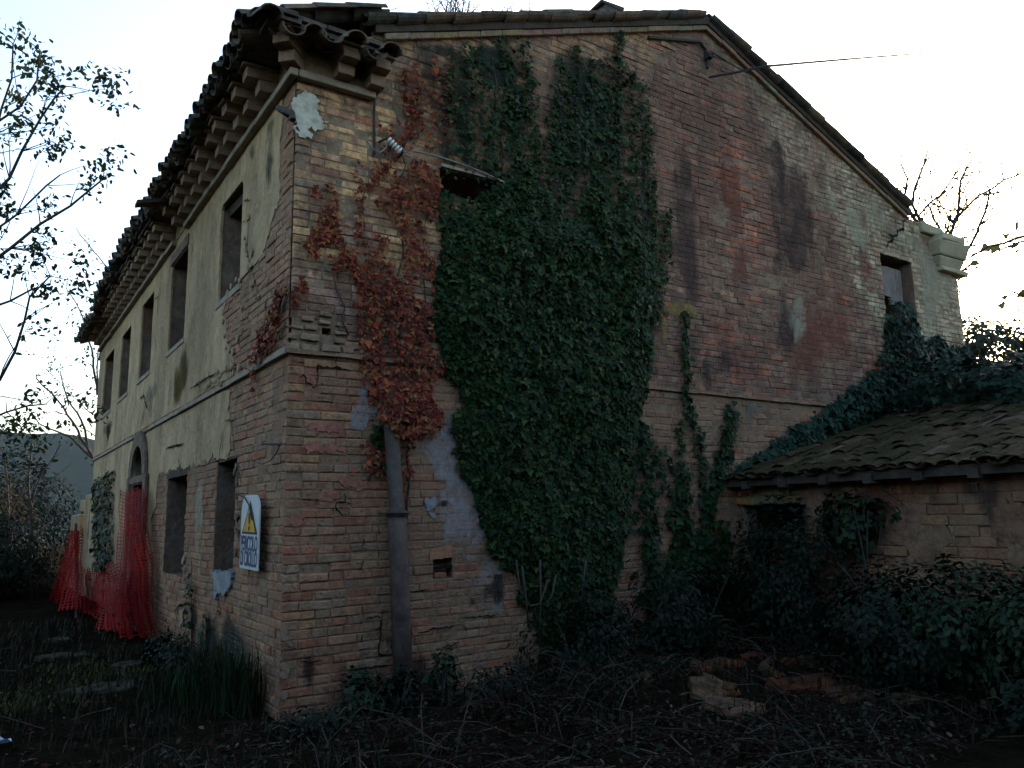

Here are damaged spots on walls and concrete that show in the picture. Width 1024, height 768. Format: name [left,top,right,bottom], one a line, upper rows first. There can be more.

peeling [291,90,328,140]
crack [886,218,909,248]
crack [190,369,218,389]
crack [295,358,351,390]
spalling [429,543,453,577]